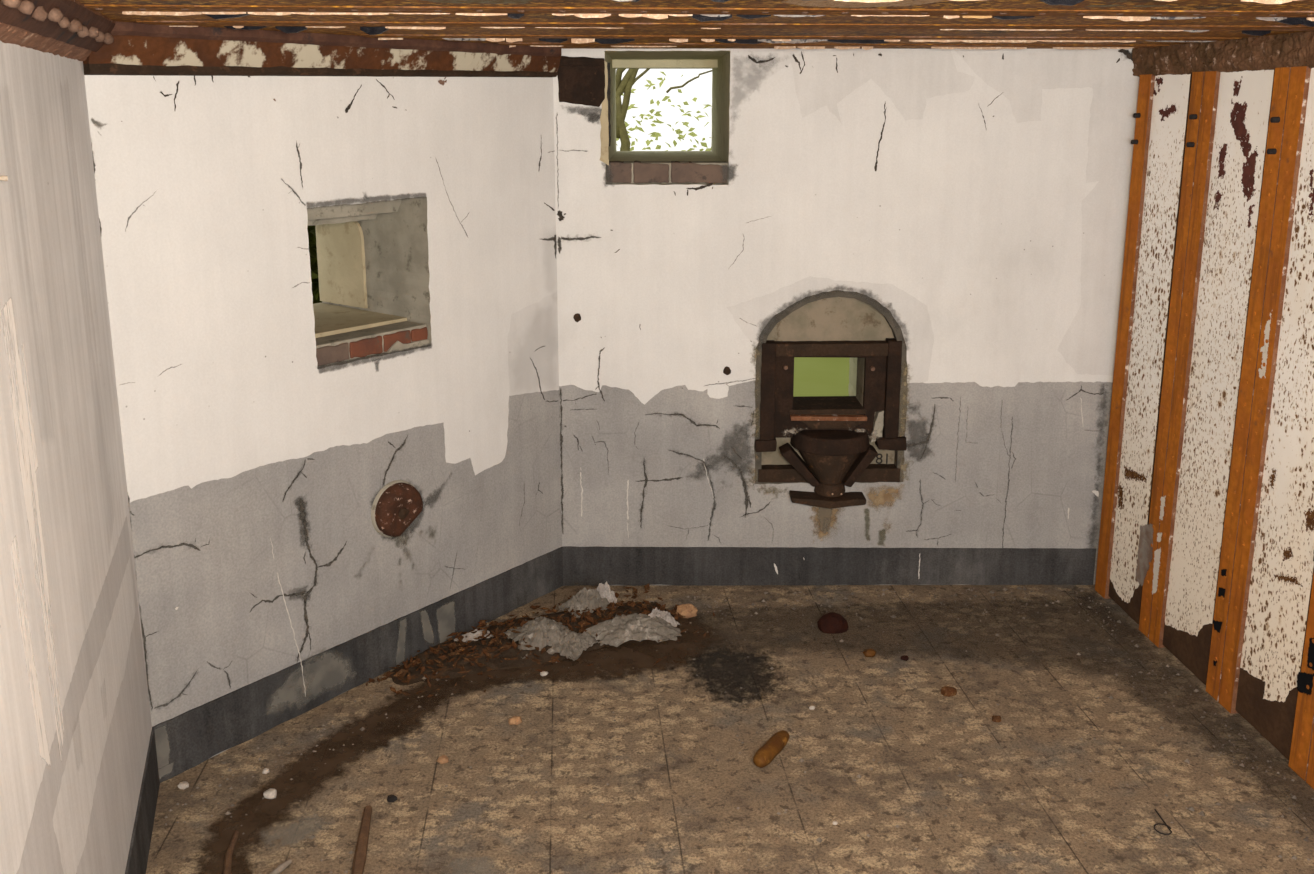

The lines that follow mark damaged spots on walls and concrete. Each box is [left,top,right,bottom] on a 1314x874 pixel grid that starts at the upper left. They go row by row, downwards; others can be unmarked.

peeling [782,0,945,8]
crack [134,539,232,709]
crack [250,458,347,662]
crack [521,346,774,543]
water stain [864,509,886,545]
peeling [1152,532,1162,594]